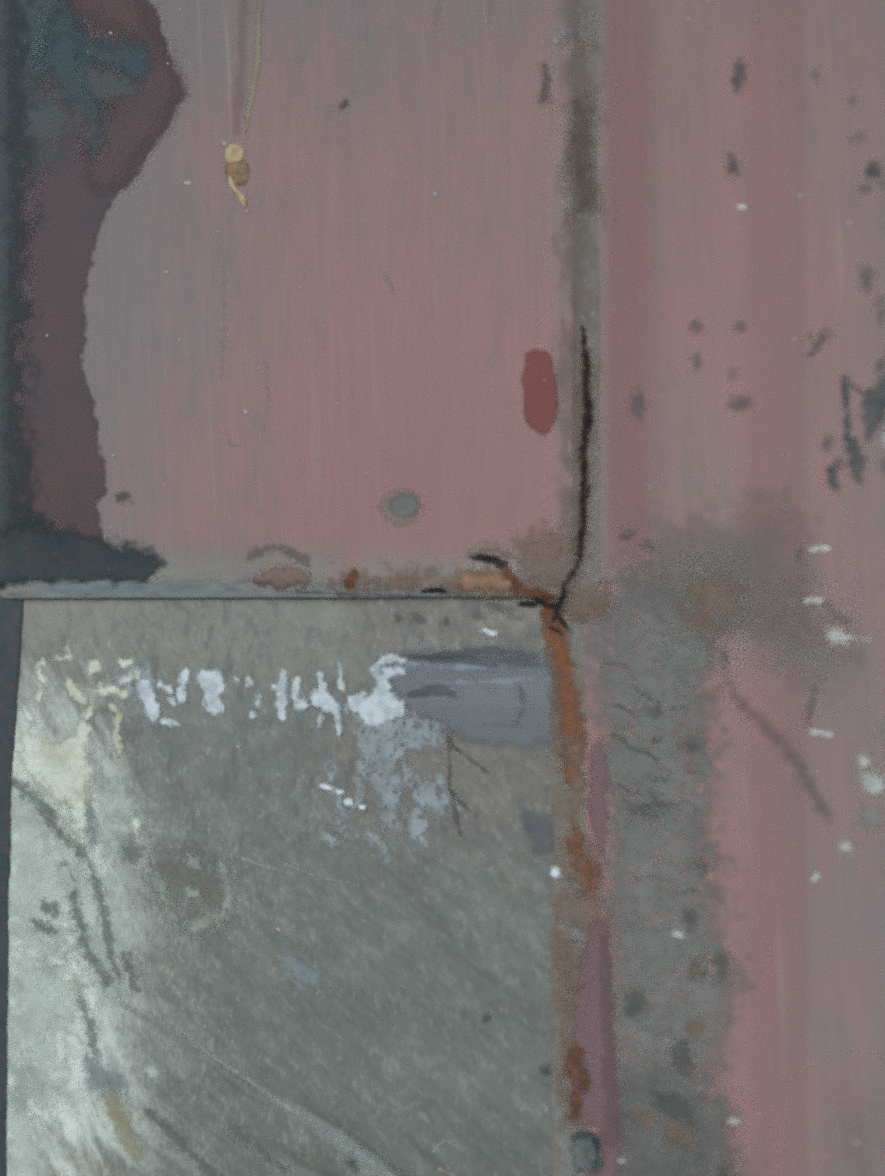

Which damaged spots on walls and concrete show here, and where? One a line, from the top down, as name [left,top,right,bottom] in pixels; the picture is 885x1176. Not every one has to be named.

corrosion [224,0,263,207]
water stain [3,0,186,547]
crack [422,586,446,594]
corrosion [328,565,586,823]
crack [518,325,593,634]
peeling [6,628,553,1176]
corrosion [551,931,591,1129]